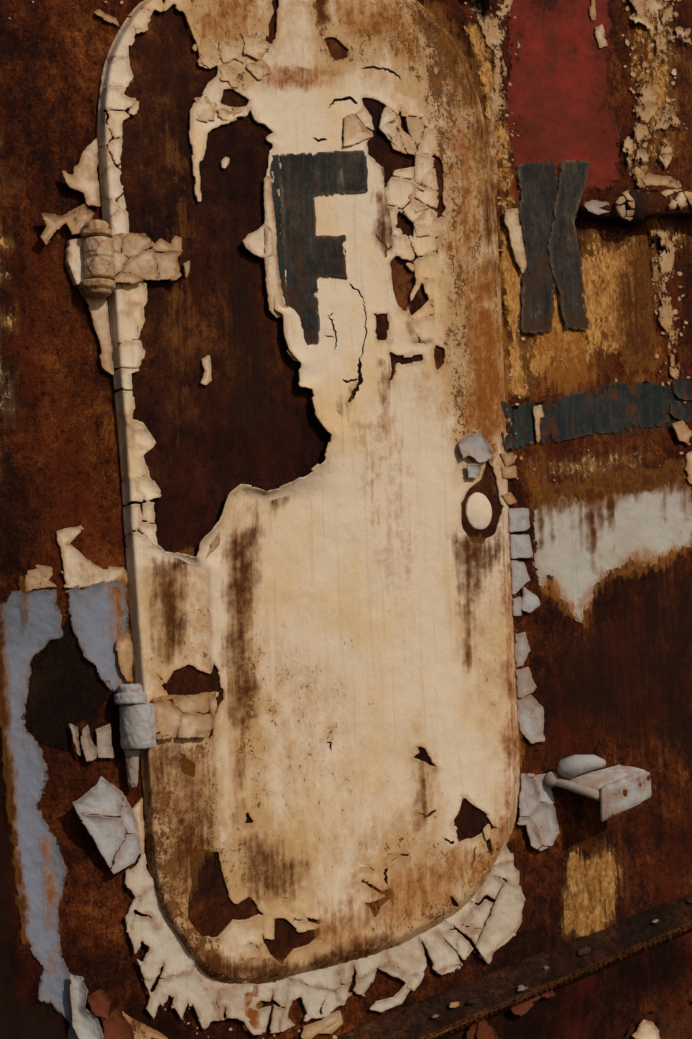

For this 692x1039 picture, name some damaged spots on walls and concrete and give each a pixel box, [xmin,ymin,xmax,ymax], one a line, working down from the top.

peeling [343,98,445,239]
peeling [116,0,331,560]
crack [325,283,367,403]
peeling [390,256,428,315]
peeling [458,0,692,623]
rust [613,248,661,370]
rust [537,461,692,553]
rust [226,511,262,739]
rust [453,534,512,666]
peeling [0,525,525,1039]
rust [195,635,521,1028]
peeling [517,773,560,851]